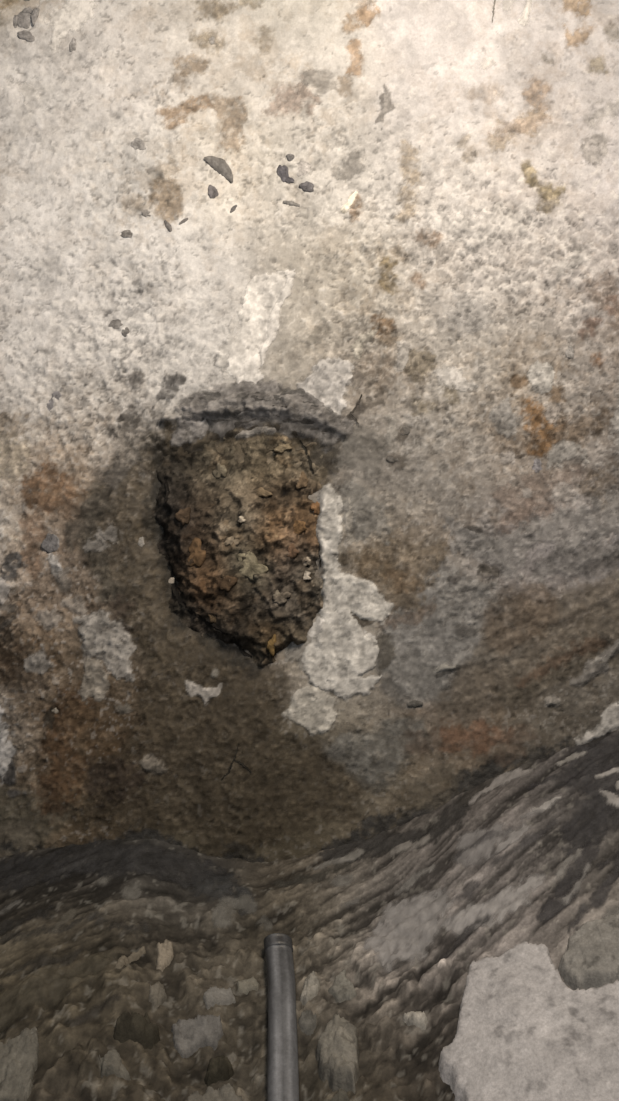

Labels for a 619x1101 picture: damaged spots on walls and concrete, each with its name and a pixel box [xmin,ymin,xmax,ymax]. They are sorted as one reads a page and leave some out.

flaking render [108,319,130,337]
flaking render [46,391,62,412]
spalling [129,372,143,388]
peeling [386,416,410,468]
peeling [434,367,487,391]
corrosion [510,374,528,388]
corrosion [496,387,614,457]
peeling [152,269,395,734]
peeling [37,406,147,701]
spalling [0,552,23,629]
peeling [24,644,51,674]
water stain [0,421,619,944]